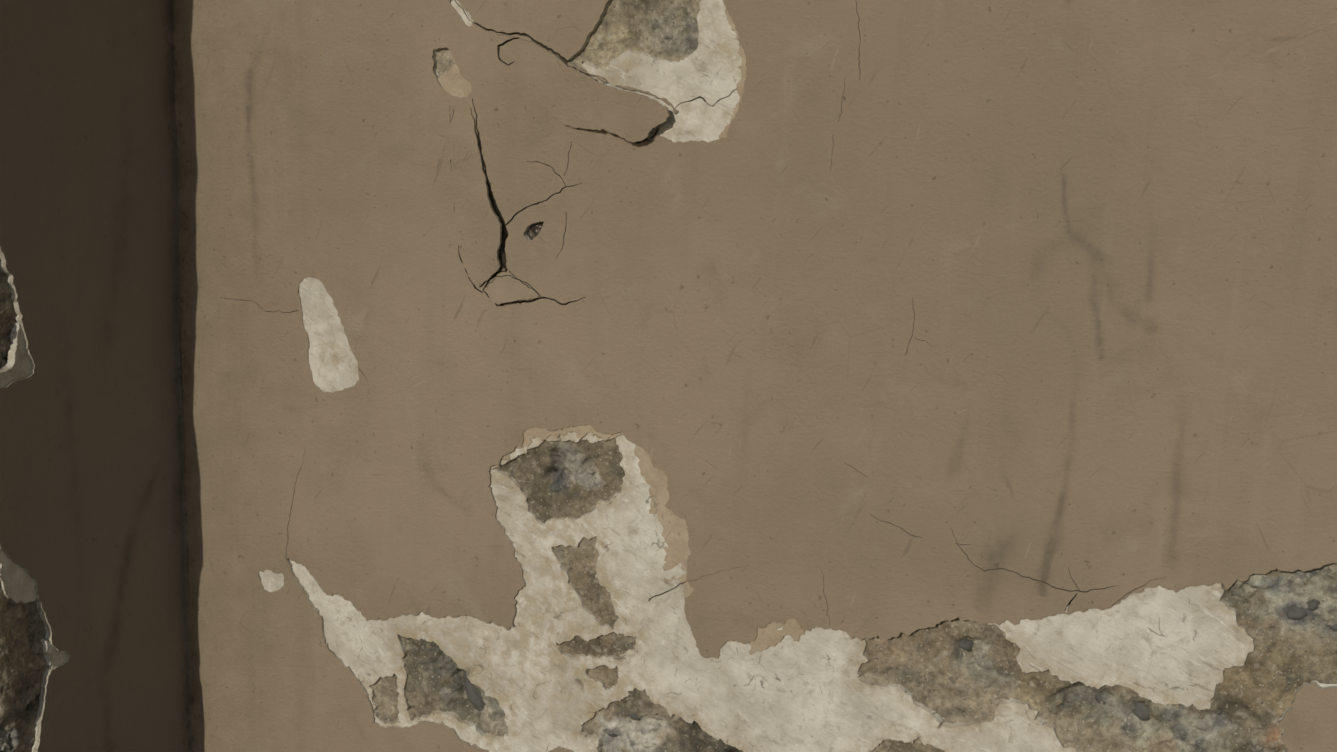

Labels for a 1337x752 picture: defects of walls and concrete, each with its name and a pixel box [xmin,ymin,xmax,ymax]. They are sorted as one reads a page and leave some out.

crack [455,0,569,66]
flaking render [497,0,747,142]
crack [450,98,586,306]
flaking render [0,256,32,387]
peeling [299,277,368,393]
flaking render [0,550,68,752]
flaking render [259,424,1337,752]